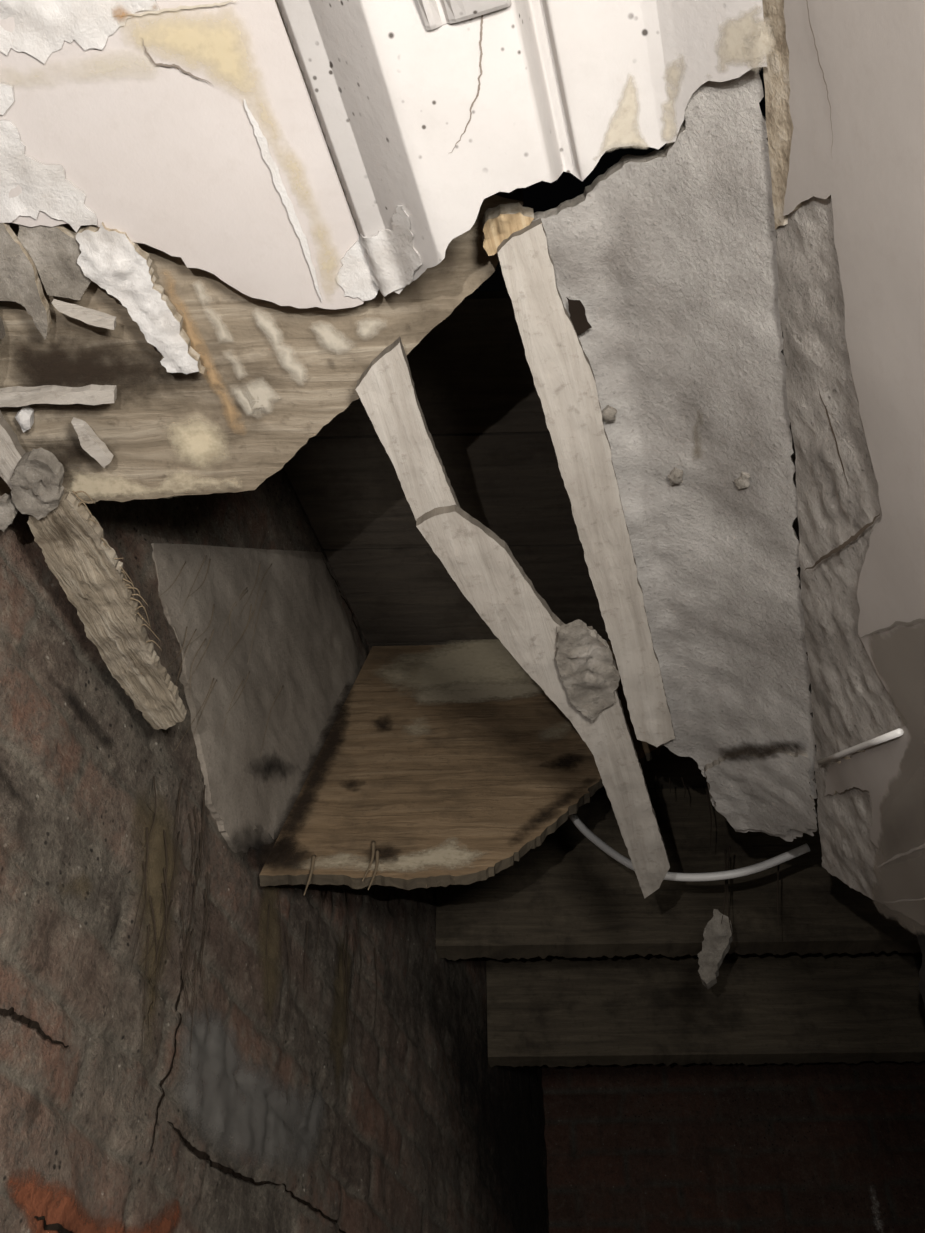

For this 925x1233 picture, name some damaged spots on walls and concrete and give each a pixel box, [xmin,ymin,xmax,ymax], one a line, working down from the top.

peeling [0,82,98,233]
peeling [0,0,159,64]
water stain [112,0,334,301]
crack [451,15,483,153]
crack [806,0,833,155]
flaking render [336,205,422,301]
crack [0,1007,70,1048]
crack [147,930,346,1233]
crack [34,1216,73,1233]